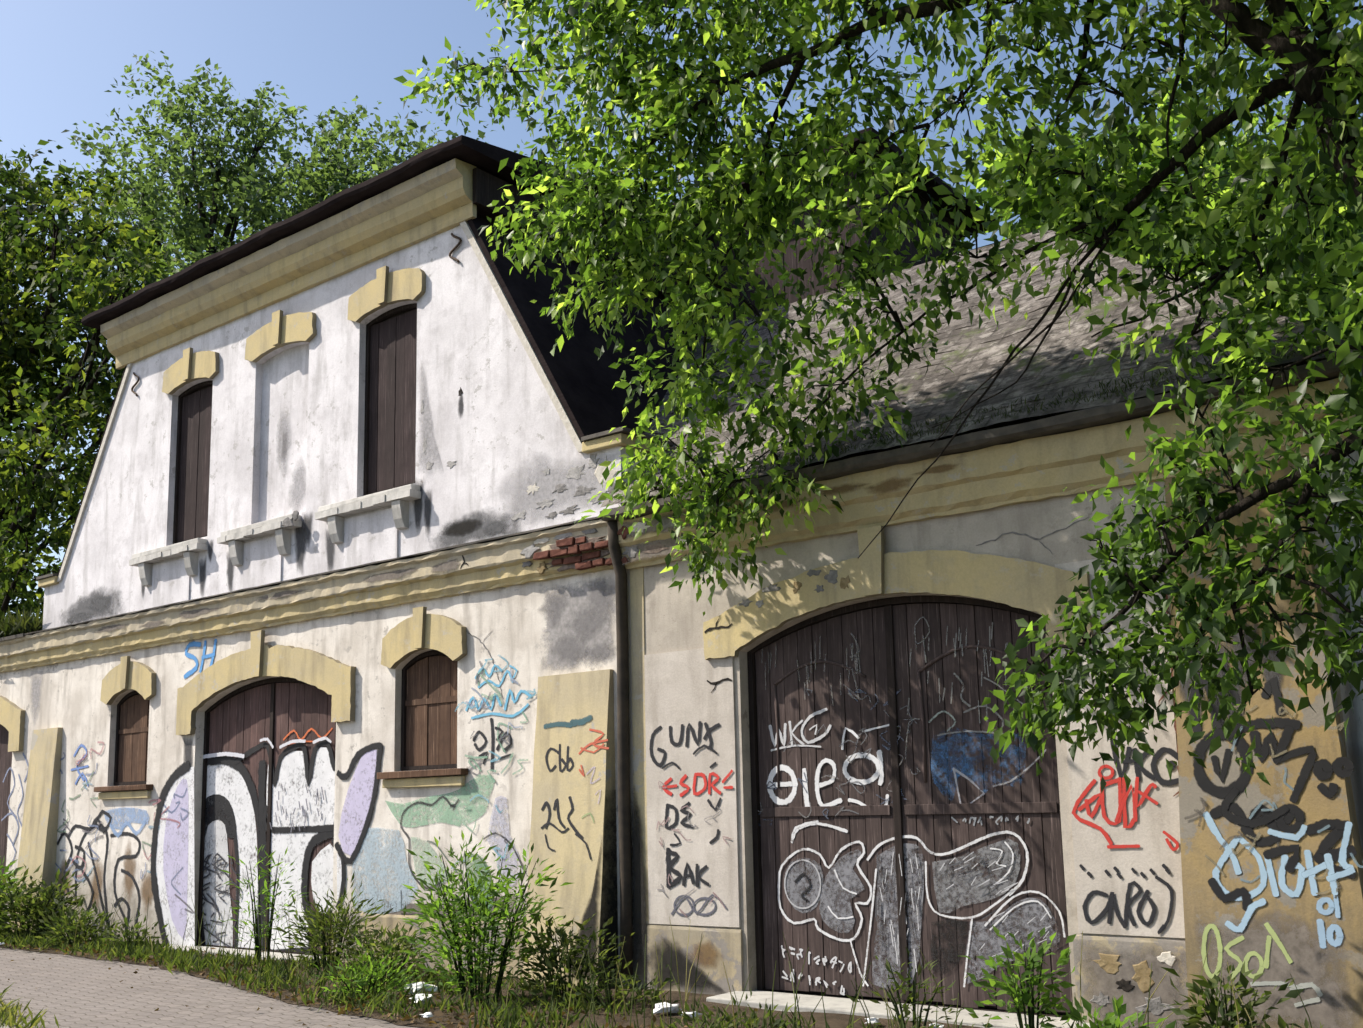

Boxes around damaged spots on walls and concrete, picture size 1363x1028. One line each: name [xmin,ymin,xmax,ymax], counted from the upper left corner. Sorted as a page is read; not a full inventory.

peeling [508,453,618,521]
damp [414,483,517,572]
crack [976,516,1090,553]
damp [66,591,163,632]
damp [181,541,217,618]
damp [256,590,303,601]
peeling [520,511,699,669]
spalling [739,569,850,608]